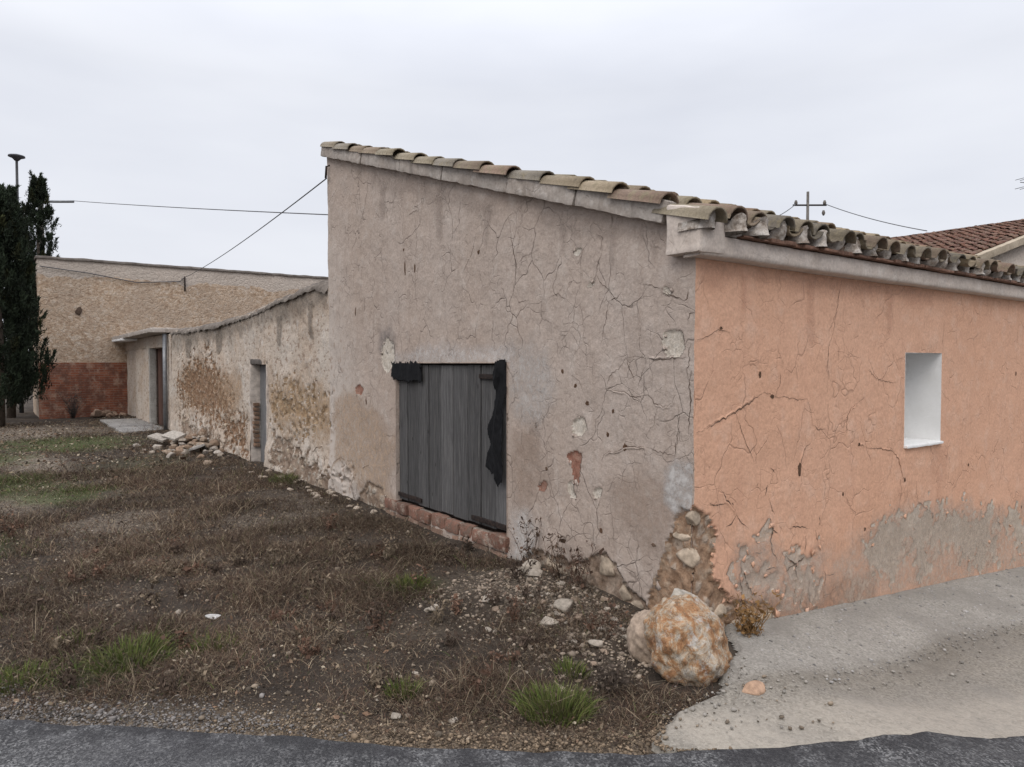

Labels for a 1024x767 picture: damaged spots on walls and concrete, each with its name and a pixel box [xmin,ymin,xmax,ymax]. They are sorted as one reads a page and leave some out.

peeling [174,343,249,459]
flaking render [268,371,331,489]
flaking render [380,337,396,373]
flaking render [567,450,582,501]
flaking render [661,330,685,357]
crack [570,281,932,602]
flaking render [526,506,824,628]